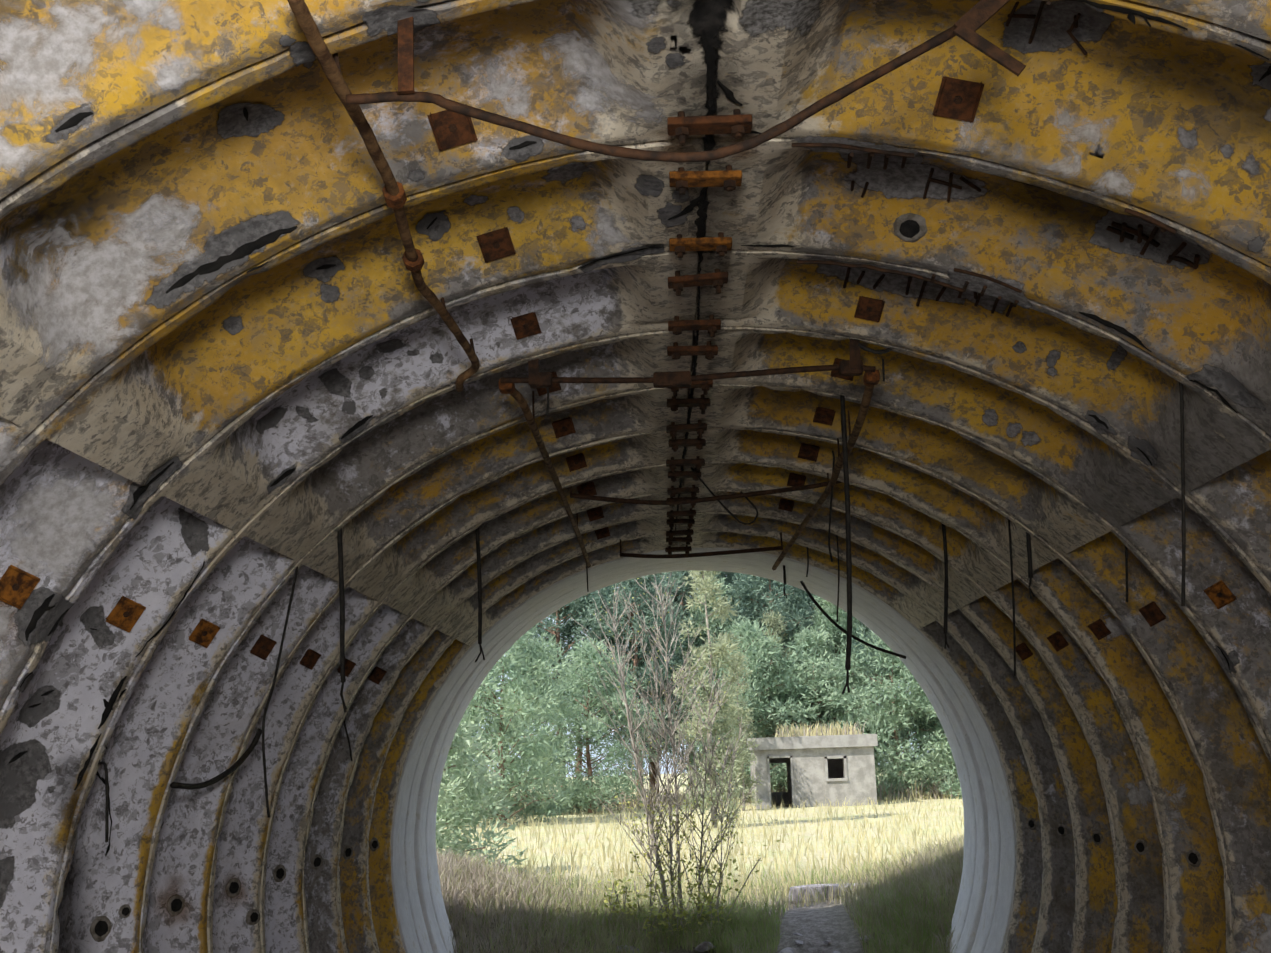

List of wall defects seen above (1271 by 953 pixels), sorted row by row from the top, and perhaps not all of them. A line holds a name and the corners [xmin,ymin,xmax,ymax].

spalling [1001,0,1115,55]
peeling [0,0,179,171]
peeling [158,58,190,90]
spalling [216,102,285,139]
spalling [791,136,988,202]
peeling [1038,112,1110,178]
peeling [1177,126,1198,150]
peeling [1220,143,1260,177]
spalling [1089,169,1212,269]
peeling [8,195,299,368]
peeling [0,456,183,647]
spalling [0,658,62,829]